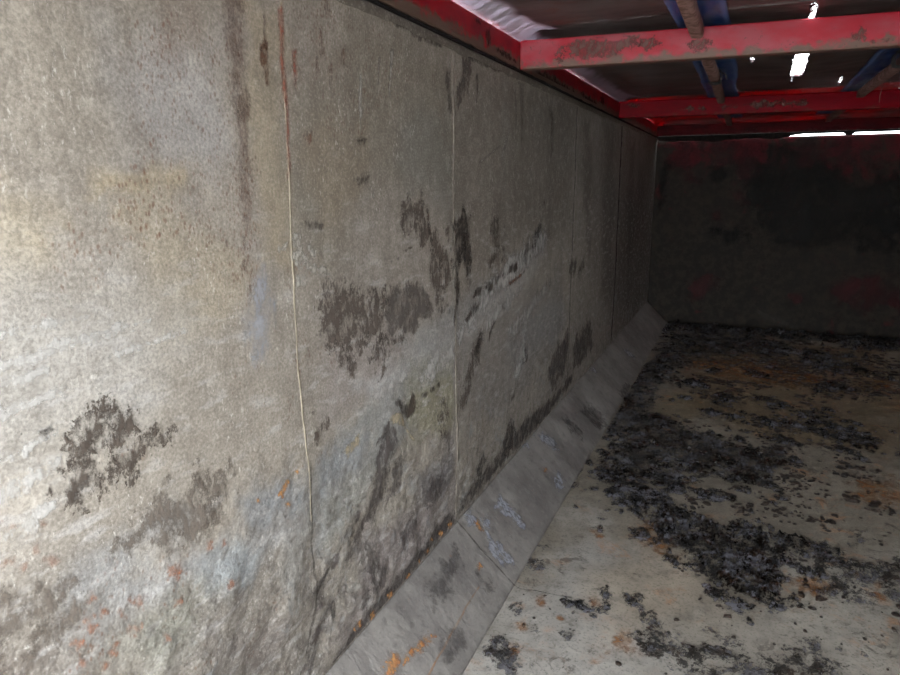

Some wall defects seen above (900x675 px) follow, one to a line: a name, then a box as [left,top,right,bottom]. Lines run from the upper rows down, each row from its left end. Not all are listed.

peeling [555,35,662,64]
leakage [314,192,518,409]
leakage [549,322,593,391]
rust [383,635,436,675]